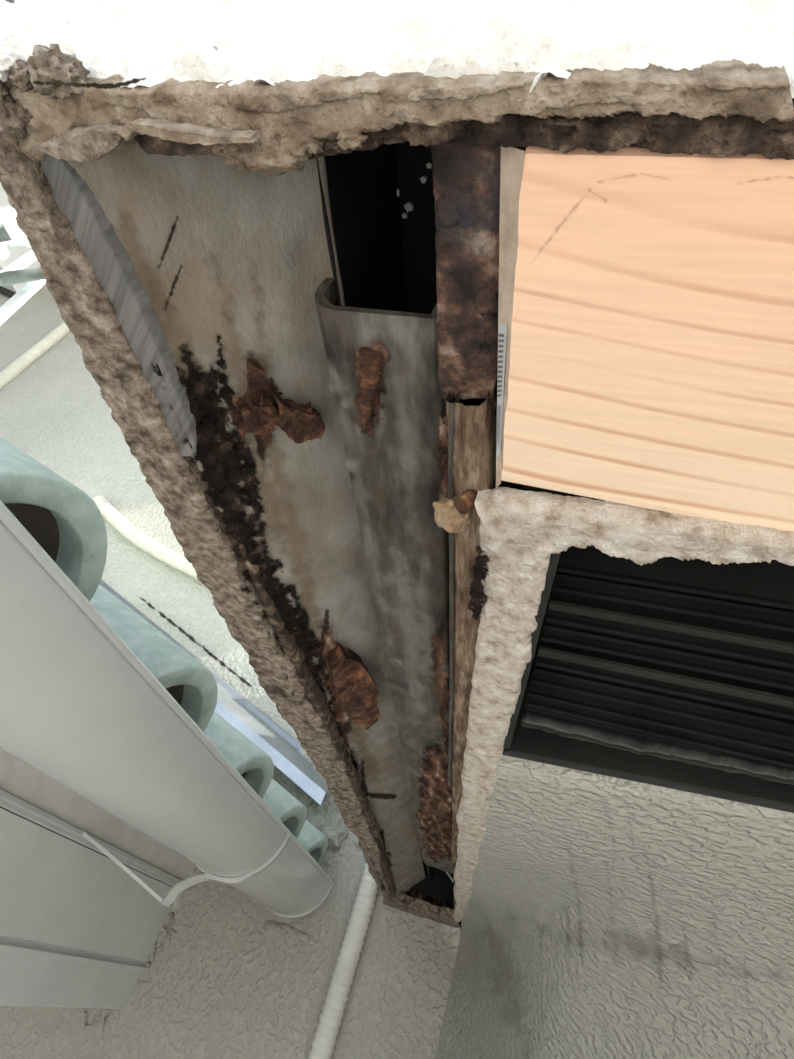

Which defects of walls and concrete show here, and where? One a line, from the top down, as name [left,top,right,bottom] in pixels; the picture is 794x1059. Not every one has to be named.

spalling [0,44,90,140]
crack [33,78,146,89]
spalling [36,118,413,312]
rust [232,352,325,464]
rust [351,341,390,436]
rust [438,416,448,498]
spalling [460,386,497,435]
rust [317,624,382,749]
rust [416,622,452,863]